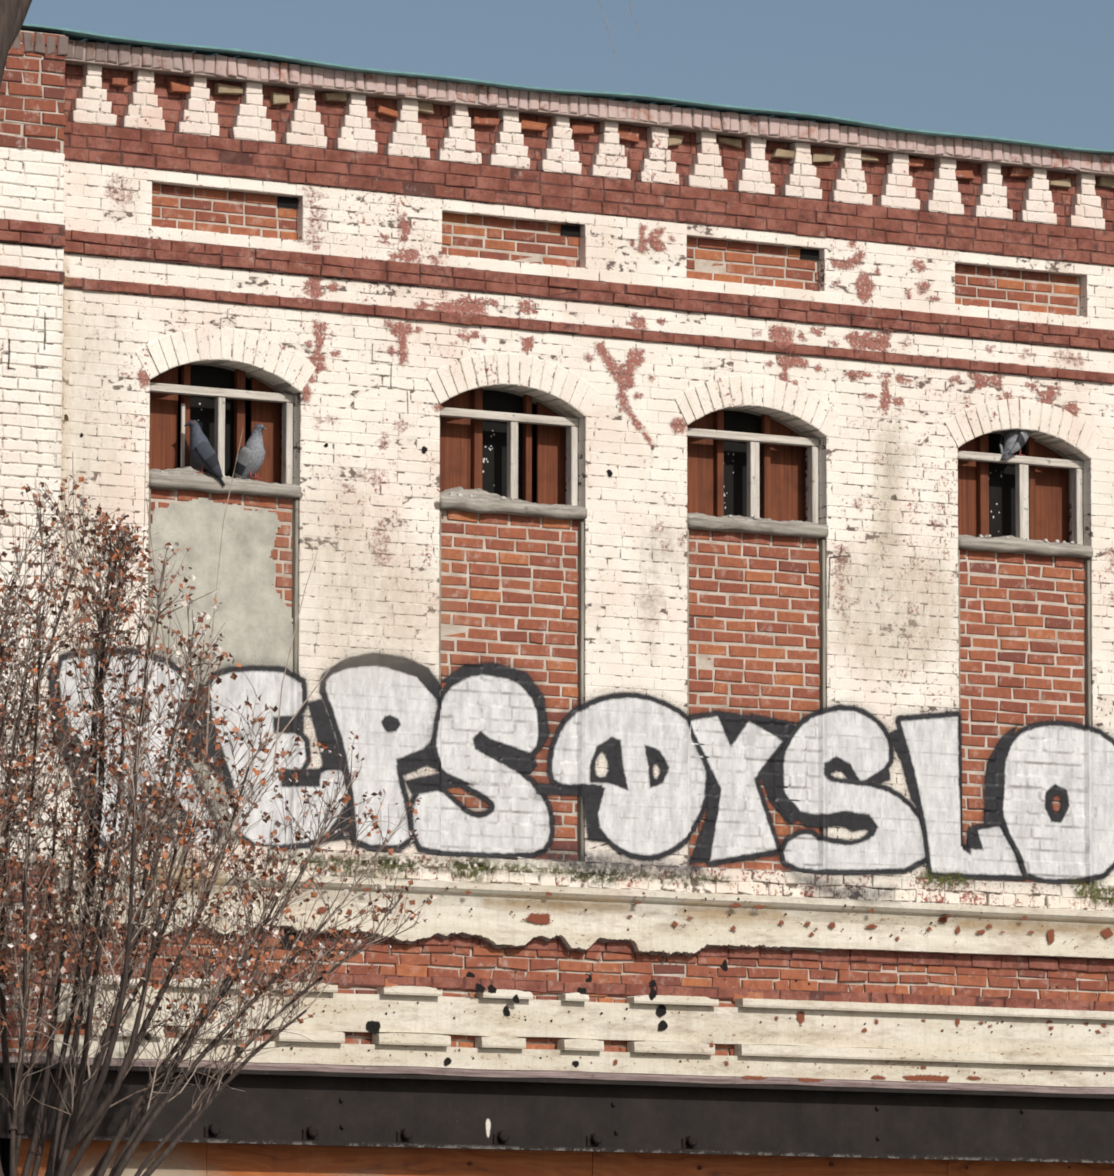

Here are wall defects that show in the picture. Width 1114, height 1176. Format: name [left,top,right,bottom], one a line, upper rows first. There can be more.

peeling [378,212,441,265]
peeling [296,276,337,304]
peeling [800,239,881,304]
peeling [905,243,940,301]
peeling [303,320,341,402]
peeling [384,321,422,365]
peeling [416,291,499,344]
peeling [519,335,534,365]
peeling [617,312,665,330]
peeling [753,325,911,390]
peeling [585,342,654,447]
peeling [949,368,1079,416]